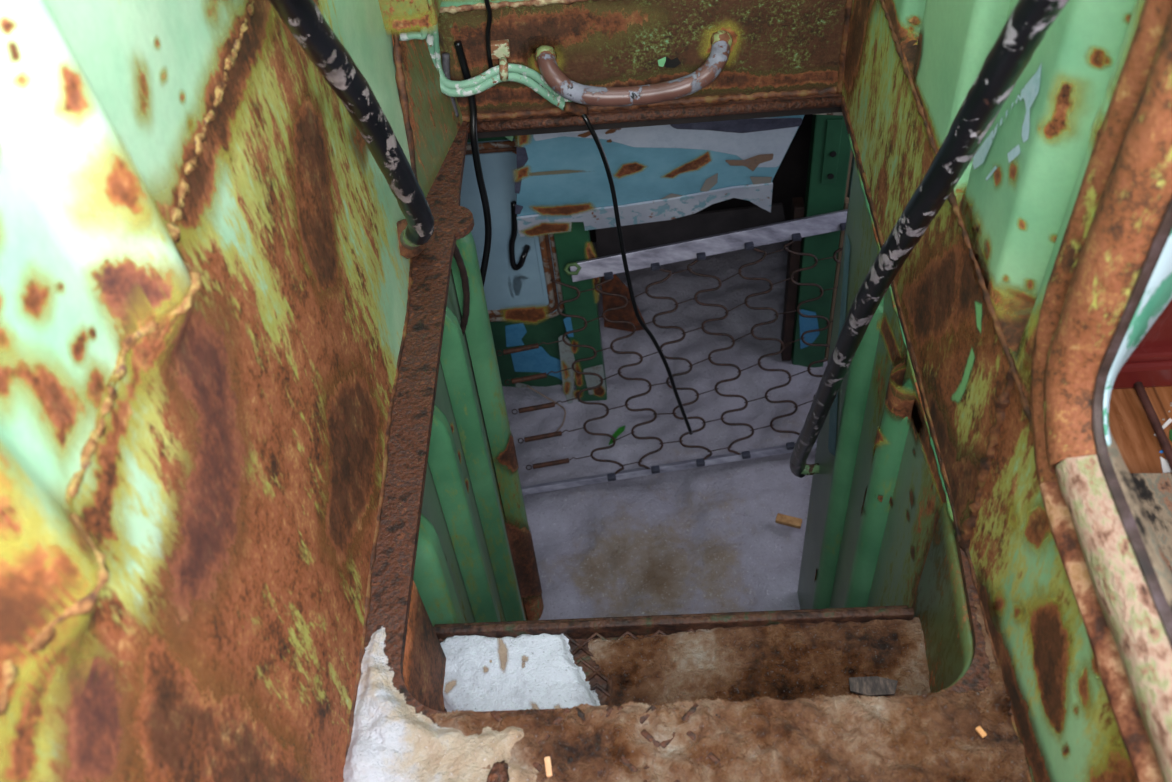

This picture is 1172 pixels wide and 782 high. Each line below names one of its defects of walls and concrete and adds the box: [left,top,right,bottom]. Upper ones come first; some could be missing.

rust [0,17,29,87]
rust [58,64,89,119]
rust [78,0,273,241]
rust [292,95,341,300]
rust [456,85,548,108]
rust [388,0,662,75]
peeling [515,118,802,214]
peeling [972,63,1042,180]
rust [1038,79,1078,140]
rust [878,188,1037,596]
rust [0,255,311,782]
rust [976,570,1100,782]